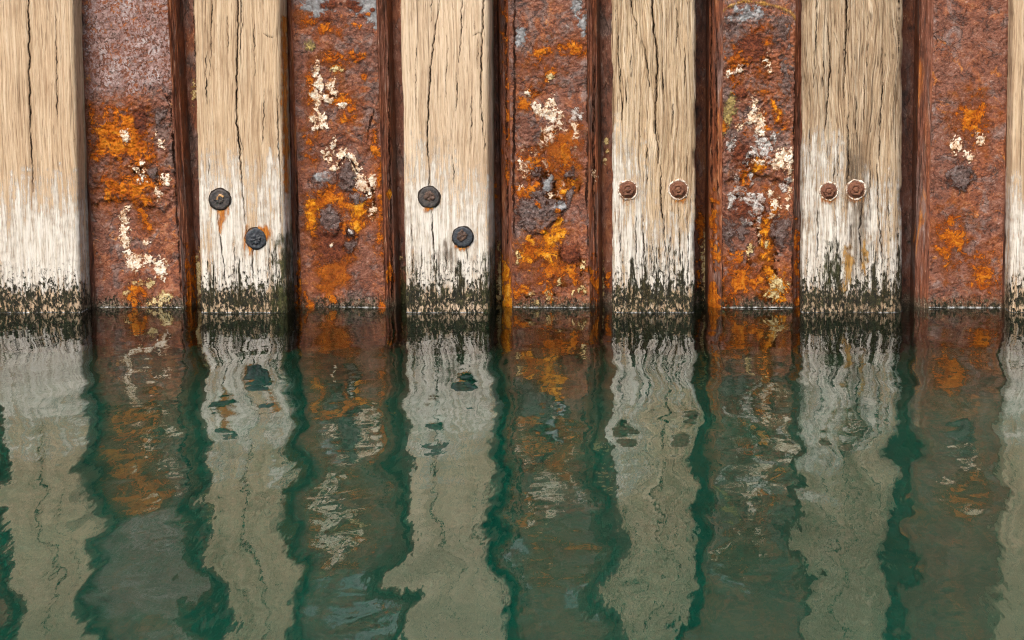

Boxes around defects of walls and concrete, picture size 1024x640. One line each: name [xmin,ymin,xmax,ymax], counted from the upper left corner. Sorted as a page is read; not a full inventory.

crack [27,0,58,181]
water stain [0,163,90,297]
crack [193,0,280,285]
water stain [199,141,294,307]
crack [411,212,468,271]
water stain [404,139,495,307]
crack [415,0,486,186]
crack [615,0,689,276]
water stain [612,124,695,307]
water stain [800,131,902,307]
crack [809,0,900,262]